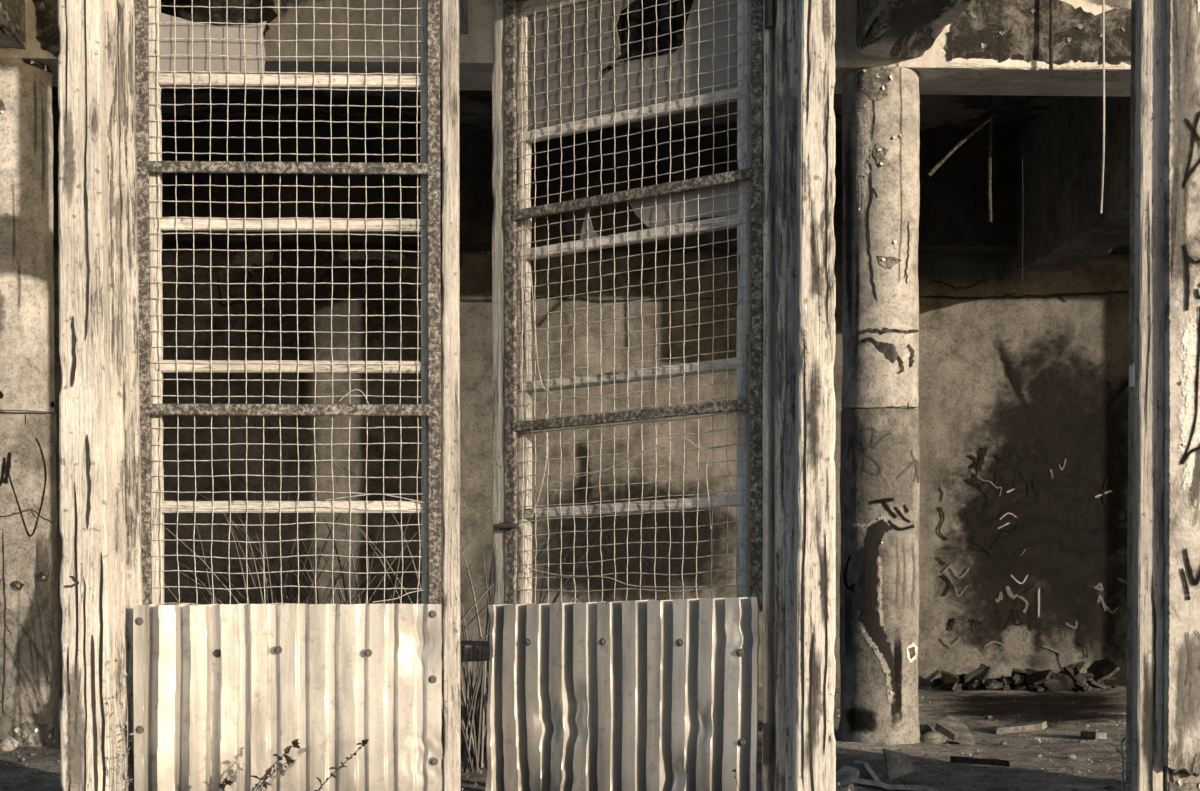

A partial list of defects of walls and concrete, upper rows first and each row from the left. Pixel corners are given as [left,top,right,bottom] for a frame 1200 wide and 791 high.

spalling [0,0,60,73]
spalling [944,0,1131,82]
peeling [1142,664,1157,782]
spalling [1169,779,1200,791]